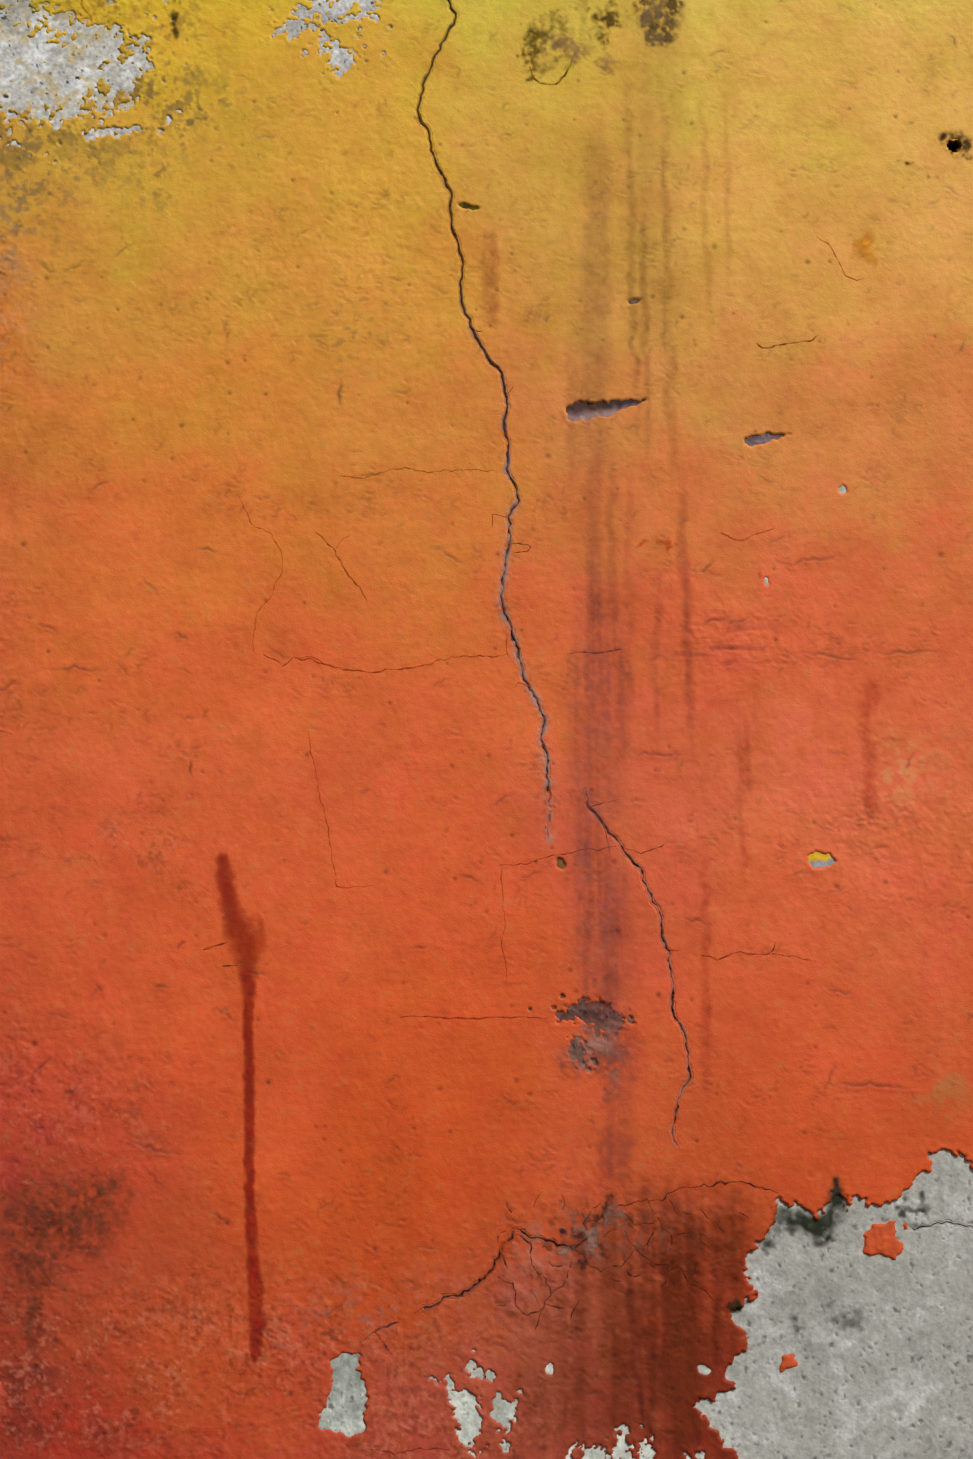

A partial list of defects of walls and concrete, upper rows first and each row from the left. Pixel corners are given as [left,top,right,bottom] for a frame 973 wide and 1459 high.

peeling [0,0,182,165]
water stain [522,28,579,81]
water stain [593,11,618,42]
water stain [634,0,683,46]
crack [239,0,818,1149]
rust [218,855,265,1357]
crack [364,1180,778,1354]
peeling [693,1149,973,1459]
crack [902,1220,973,1231]
peeling [318,1353,368,1437]
peeling [429,1349,522,1458]
peeling [566,1423,656,1459]